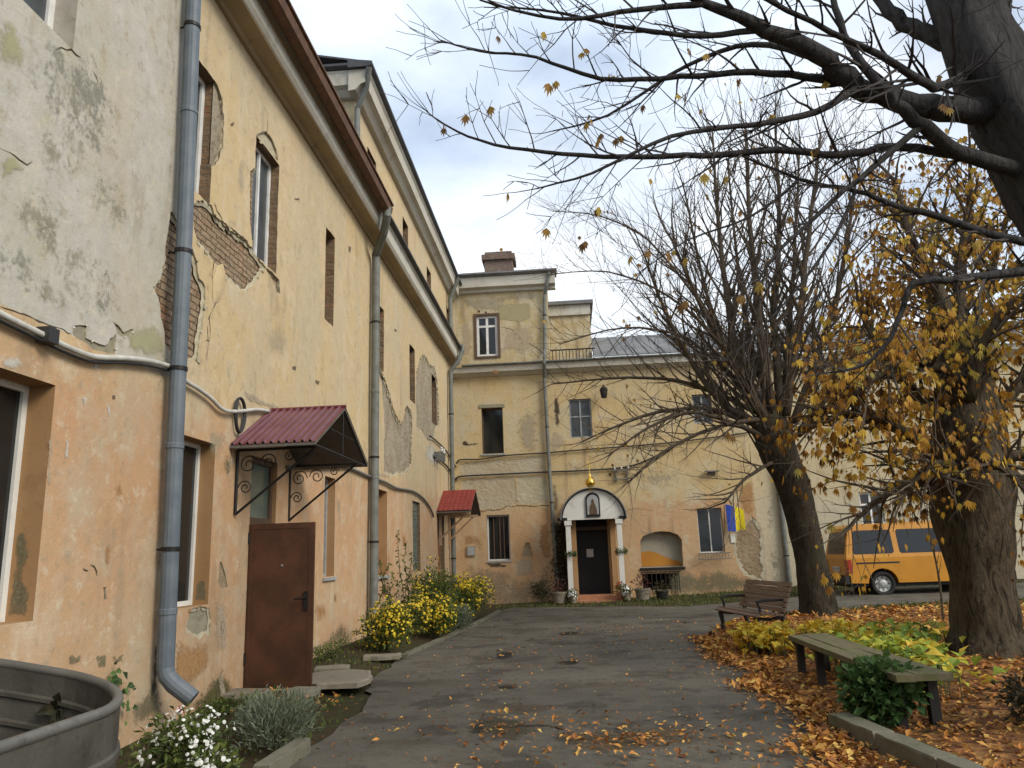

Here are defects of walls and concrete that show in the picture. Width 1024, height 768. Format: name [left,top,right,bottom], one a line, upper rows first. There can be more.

mould [45,48,106,164]
spalling [209,78,234,165]
peeling [72,324,134,354]
spalling [153,210,176,356]
spalling [187,201,280,363]
spalling [379,354,439,476]
spalling [732,516,766,586]
peeling [177,580,224,682]